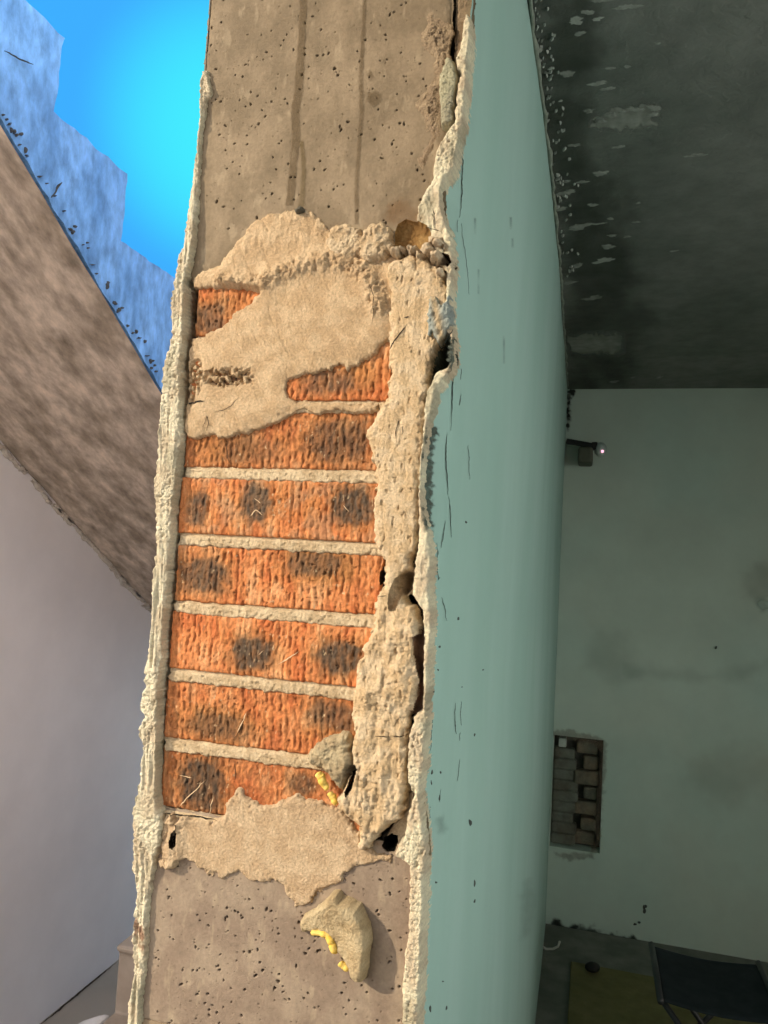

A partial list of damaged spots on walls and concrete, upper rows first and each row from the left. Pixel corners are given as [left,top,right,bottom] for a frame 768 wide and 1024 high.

flaking render [0,12,477,1024]
damp [286,0,306,205]